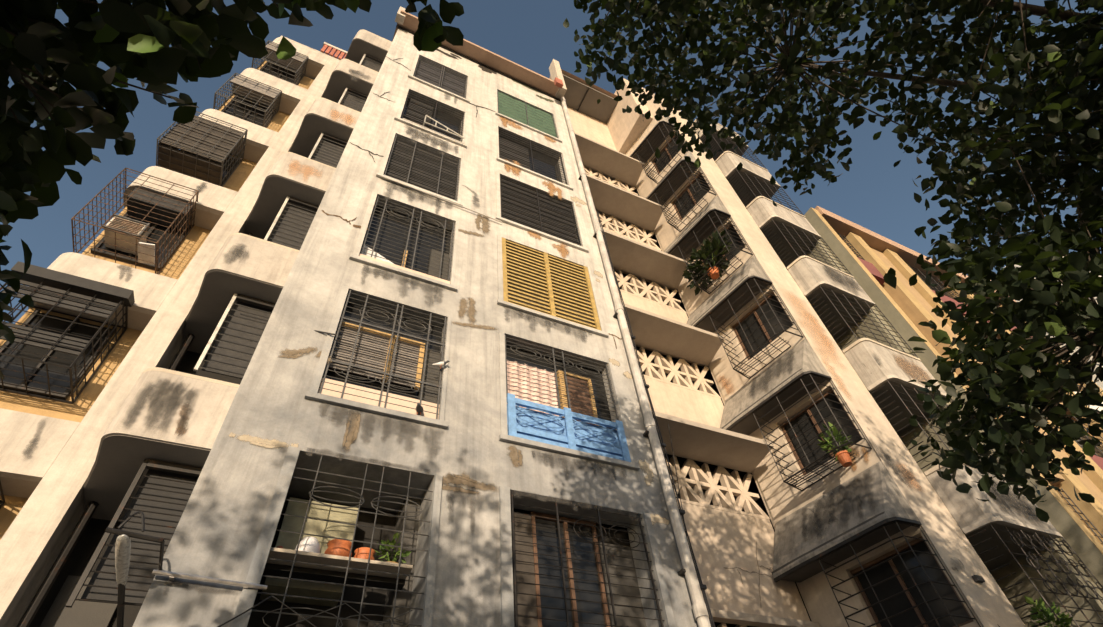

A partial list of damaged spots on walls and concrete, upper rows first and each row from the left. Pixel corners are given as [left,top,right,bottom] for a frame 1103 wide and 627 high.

crack [322,210,368,230]
peeling [458,298,467,317]
leakage [125,382,196,435]
leakage [803,472,874,537]
crack [726,542,773,602]